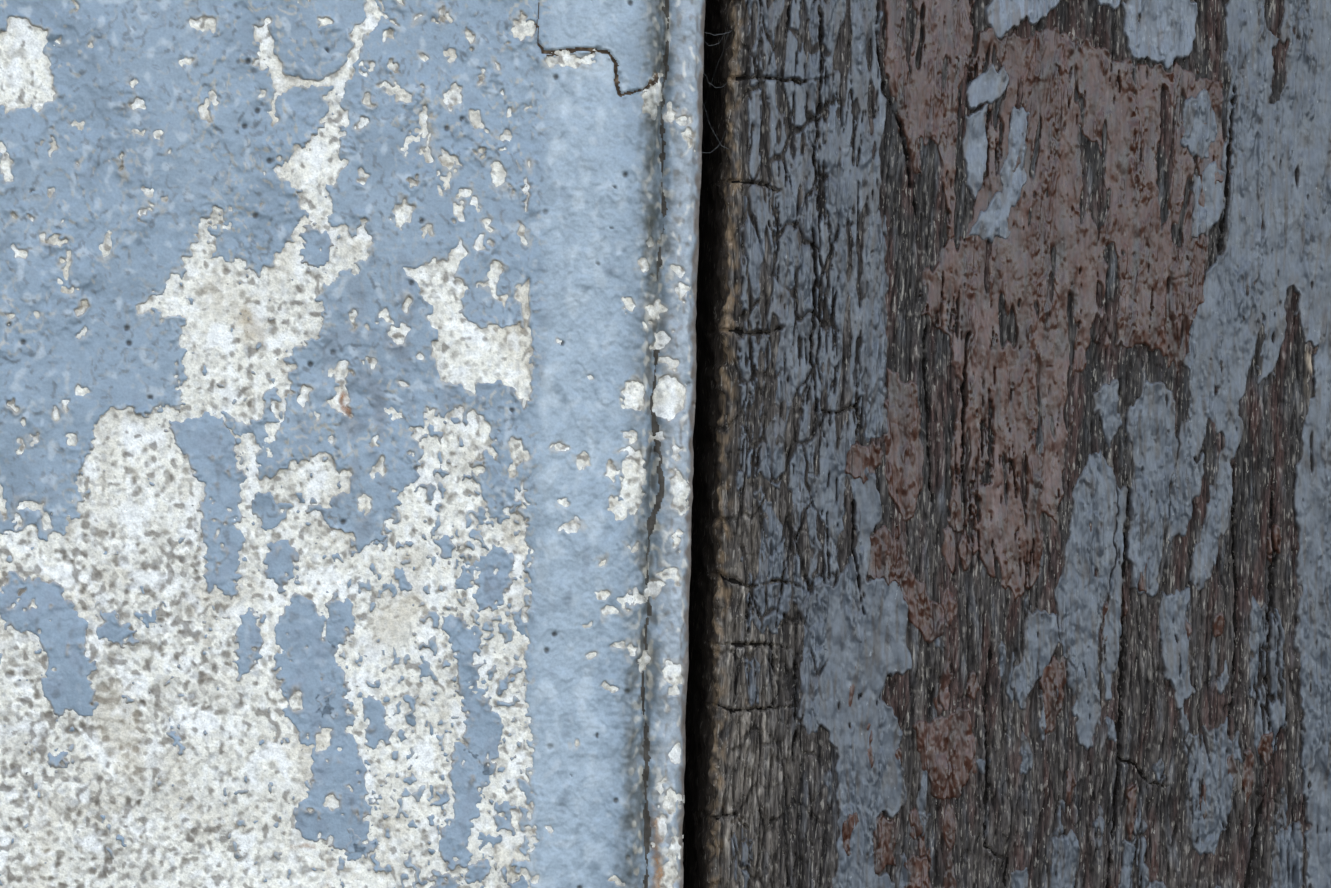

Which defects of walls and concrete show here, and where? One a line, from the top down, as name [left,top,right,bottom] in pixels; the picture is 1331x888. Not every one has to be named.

crack [534,0,669,279]
peeling [0,0,553,888]
spalling [557,498,580,534]
spalling [550,443,590,470]
crack [641,349,665,888]
peeling [735,0,1331,888]
peeling [730,825,753,888]